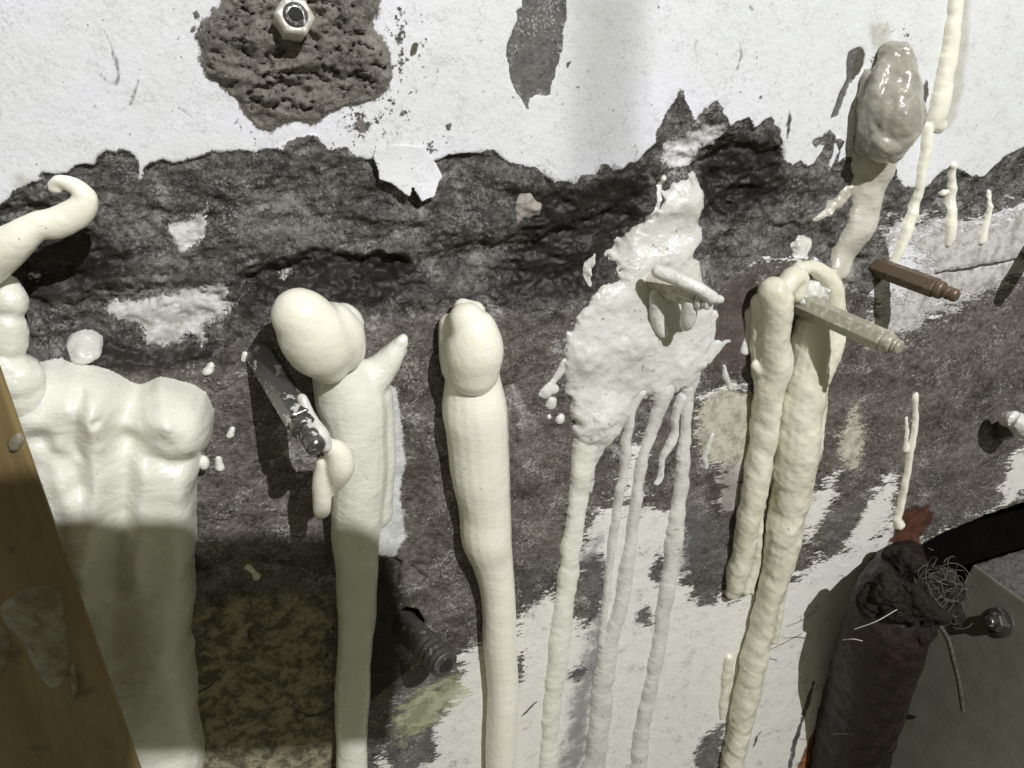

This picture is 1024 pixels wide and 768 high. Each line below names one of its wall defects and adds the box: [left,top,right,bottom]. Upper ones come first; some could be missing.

spalling [384,7,427,81]
peeling [506,0,571,108]
spalling [842,147,1024,324]
spalling [0,88,855,768]
peeling [790,273,1024,583]
rust [889,504,934,545]
rust [798,730,815,768]